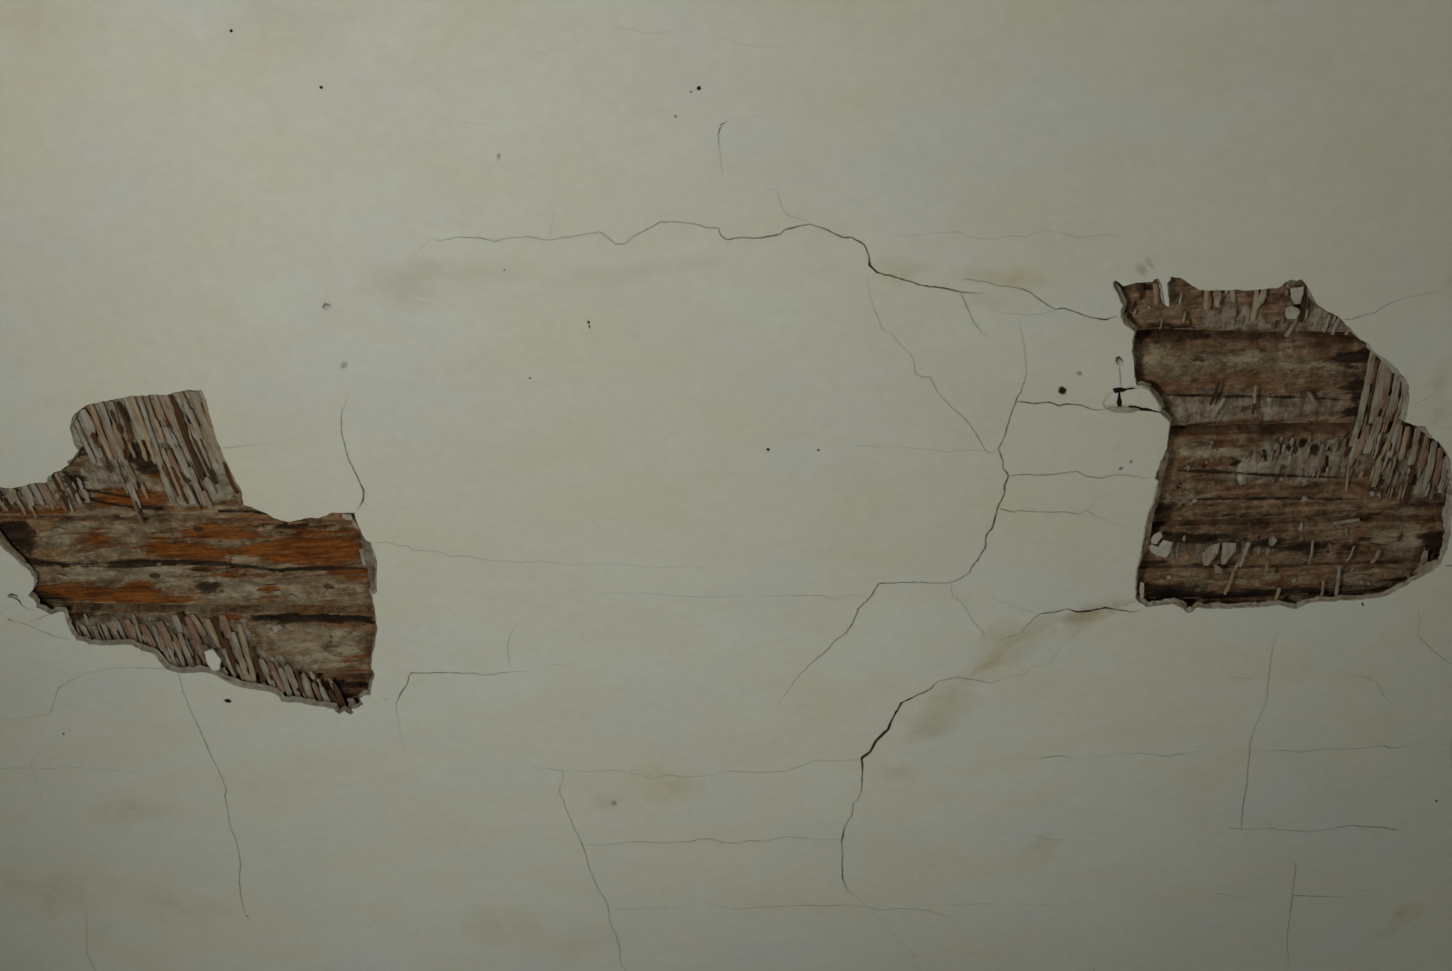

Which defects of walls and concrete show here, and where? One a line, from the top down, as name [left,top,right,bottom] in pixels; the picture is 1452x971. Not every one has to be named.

crack [728,225,965,293]
spalling [67,405,87,465]
crack [972,402,1088,567]
spalling [1106,277,1452,613]
spalling [0,512,378,715]
crack [1042,606,1129,614]
crack [861,686,933,783]